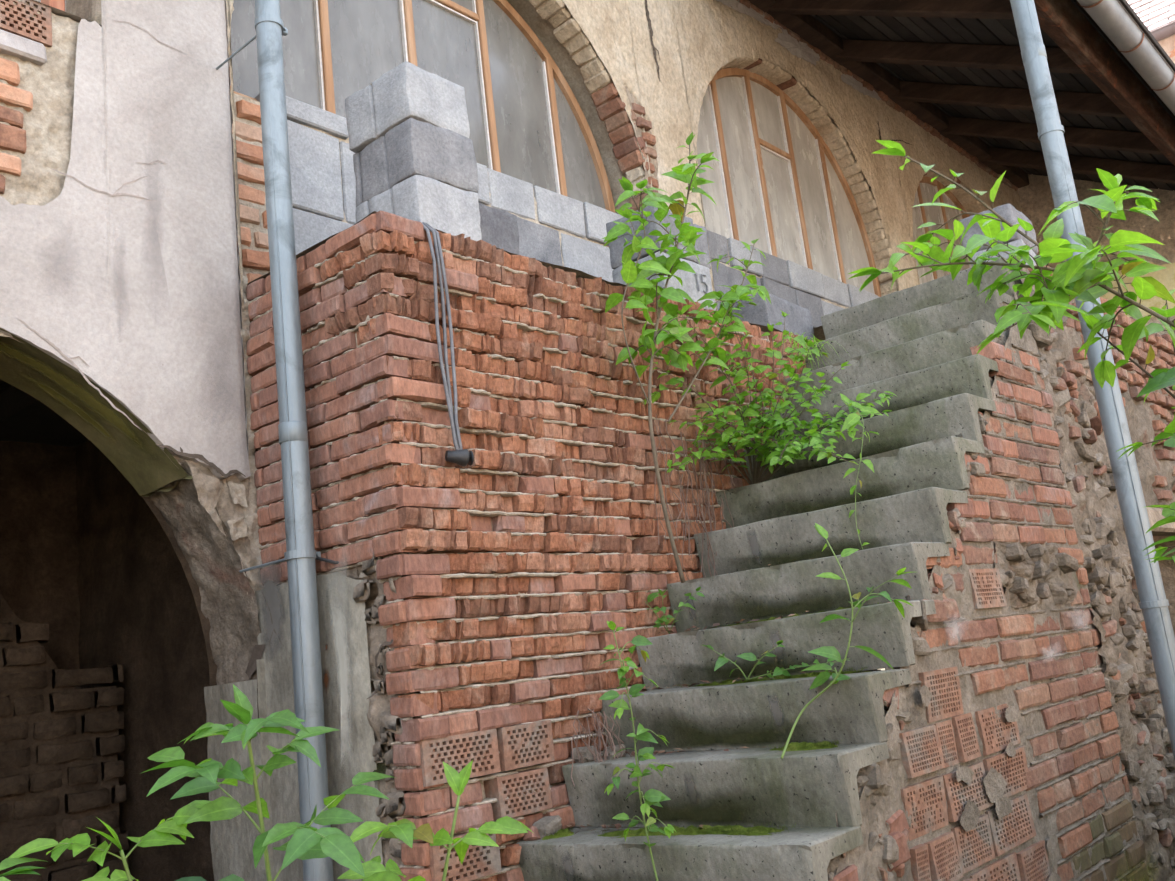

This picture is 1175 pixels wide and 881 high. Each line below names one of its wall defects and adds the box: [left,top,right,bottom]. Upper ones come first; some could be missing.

crack [115,20,186,54]
crack [645,0,660,81]
flaking render [0,0,79,206]
crack [48,160,167,201]
flaking render [1101,259,1175,318]
flaking render [162,450,254,603]
spalling [993,541,1079,608]